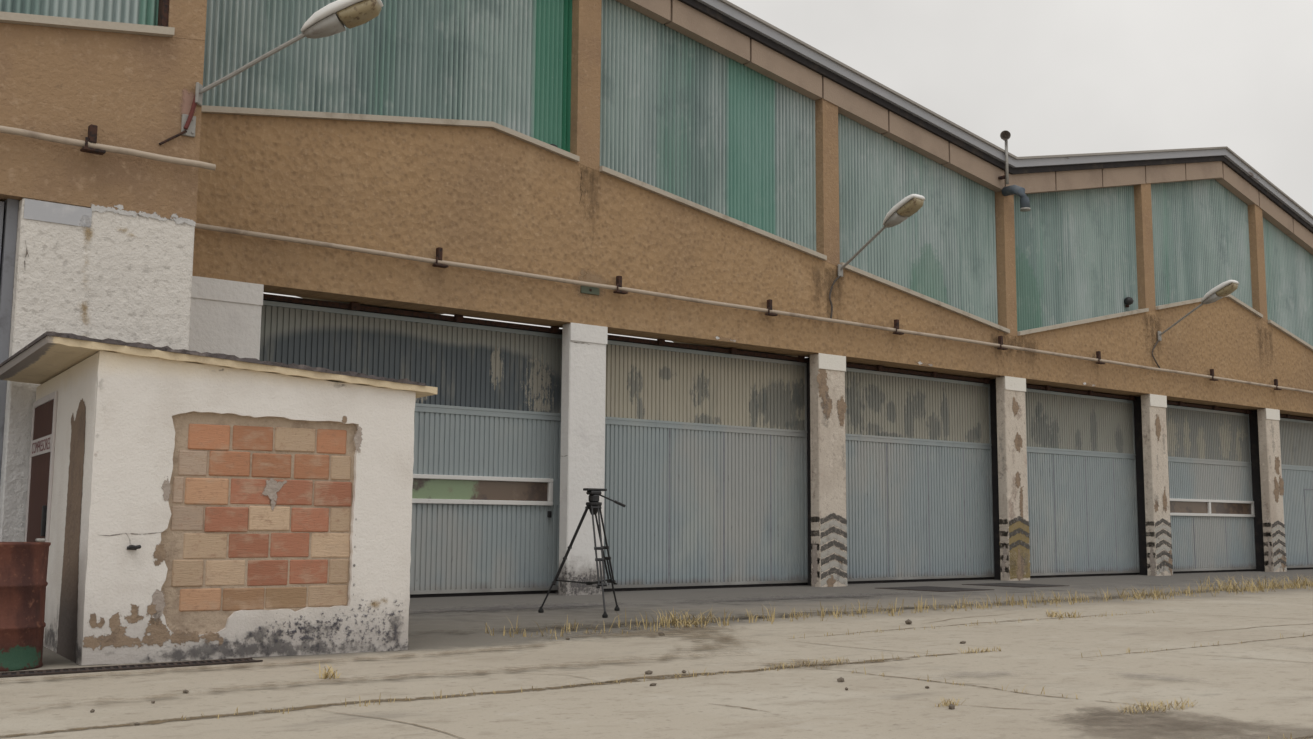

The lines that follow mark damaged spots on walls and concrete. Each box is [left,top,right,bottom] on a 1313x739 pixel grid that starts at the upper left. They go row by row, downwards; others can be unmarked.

flaking render [816,365,847,426]
flaking render [1014,432,1023,452]
flaking render [1015,471,1023,518]
flaking render [57,399,224,663]